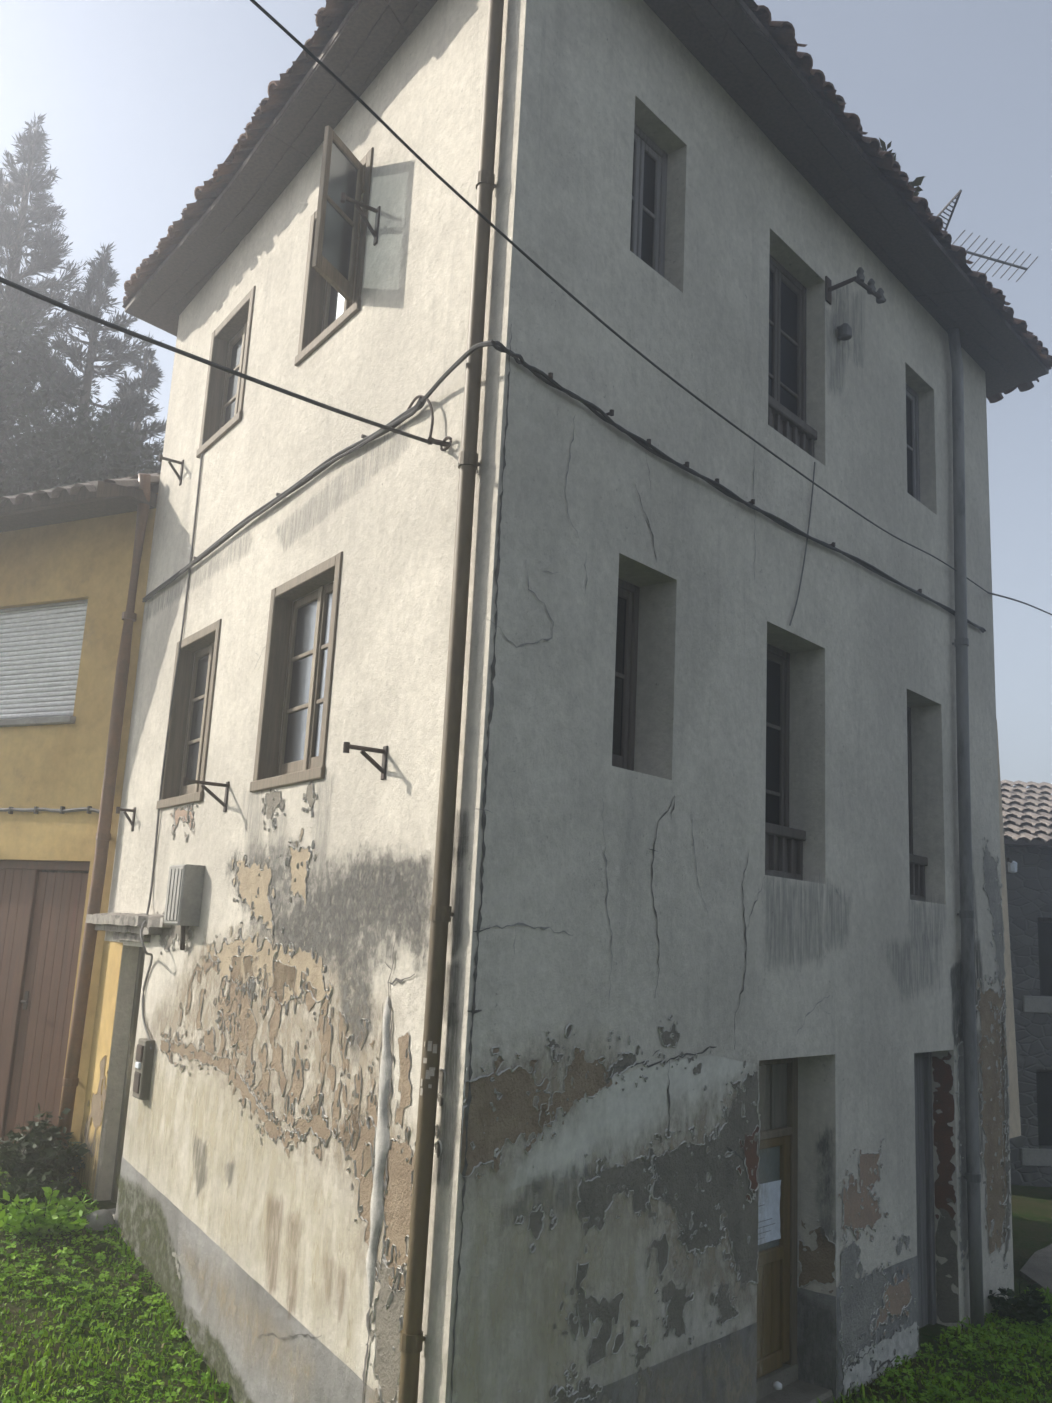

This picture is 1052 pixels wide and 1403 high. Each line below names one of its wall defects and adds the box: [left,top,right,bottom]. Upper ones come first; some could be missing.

leakage [152,842,432,1223]
peeling [154,781,761,1403]
crack [451,324,588,1403]
crack [602,799,613,996]
crack [650,796,709,993]
crack [611,849,765,1133]
peeling [797,1138,920,1400]
peeling [932,837,1012,1323]